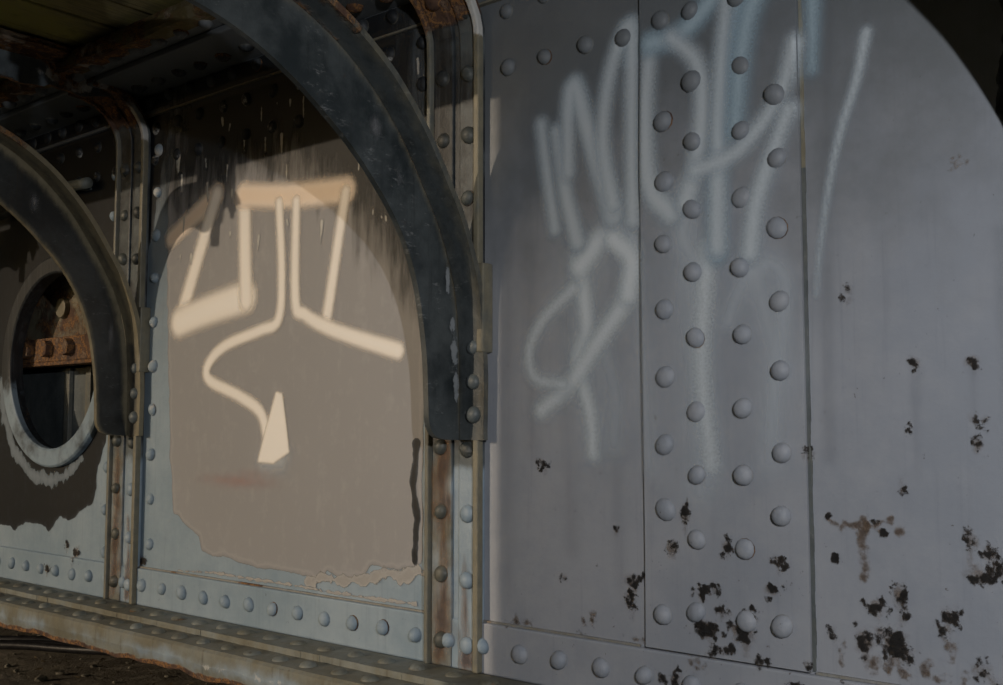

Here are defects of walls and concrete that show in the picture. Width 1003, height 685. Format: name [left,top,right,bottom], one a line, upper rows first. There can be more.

corrosion [971,415,989,452]
water stain [409,438,420,565]
corrosion [679,499,691,524]
corrosion [720,534,734,560]
corrosion [770,555,790,572]
corrosion [825,512,903,582]
corrosion [962,527,1003,588]
corrosion [624,572,645,610]
corrosion [692,583,757,658]
corrosion [853,582,938,682]
corrosion [936,610,964,659]
corrosion [658,661,699,685]